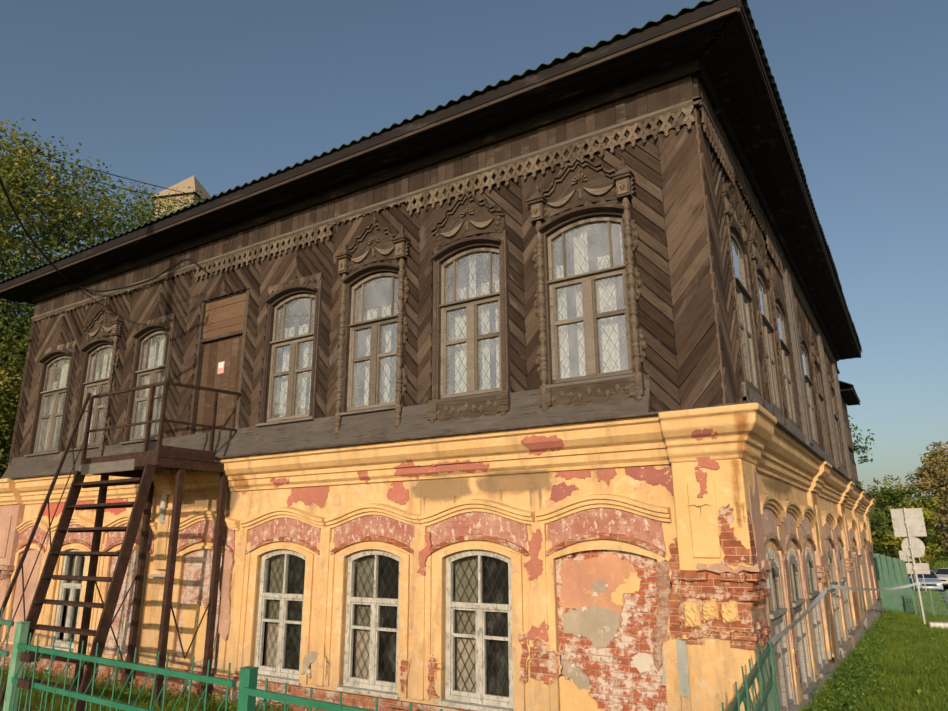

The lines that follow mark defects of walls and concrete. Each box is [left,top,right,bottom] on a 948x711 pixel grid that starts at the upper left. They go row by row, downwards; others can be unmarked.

peeling [248,477,330,548]
peeling [386,458,490,505]
peeling [521,435,564,456]
peeling [695,457,720,498]
flaking render [178,520,235,664]
peeling [333,464,880,711]